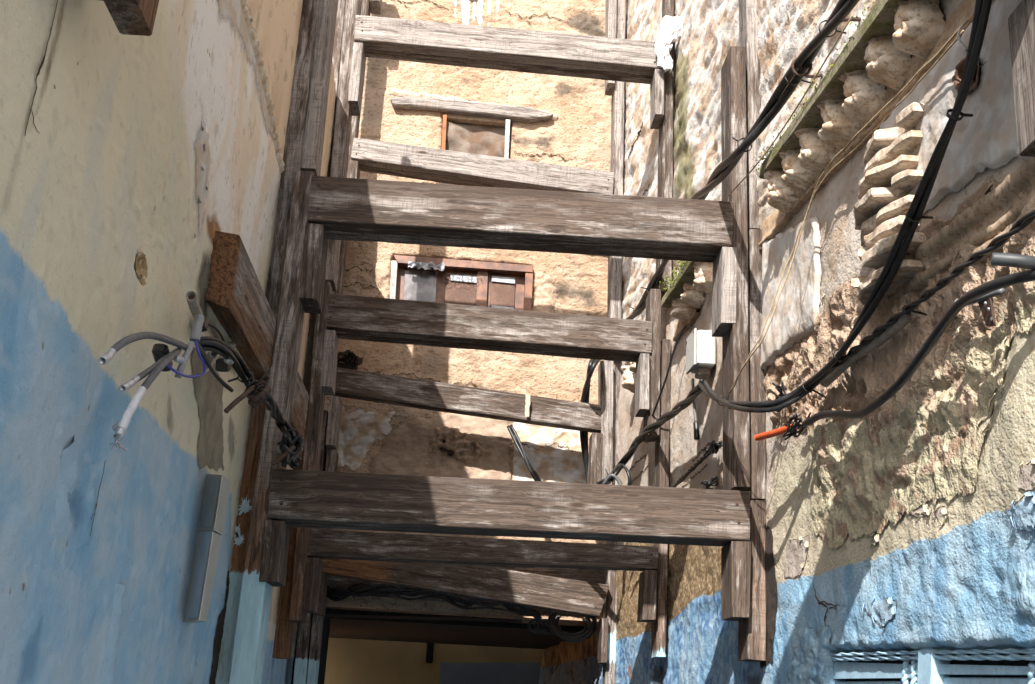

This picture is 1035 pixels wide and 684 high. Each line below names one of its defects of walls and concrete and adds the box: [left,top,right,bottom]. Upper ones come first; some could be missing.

crack [25,0,58,135]
spalling [763,175,1035,436]
peeling [910,504,949,525]
peeling [1010,458,1035,532]